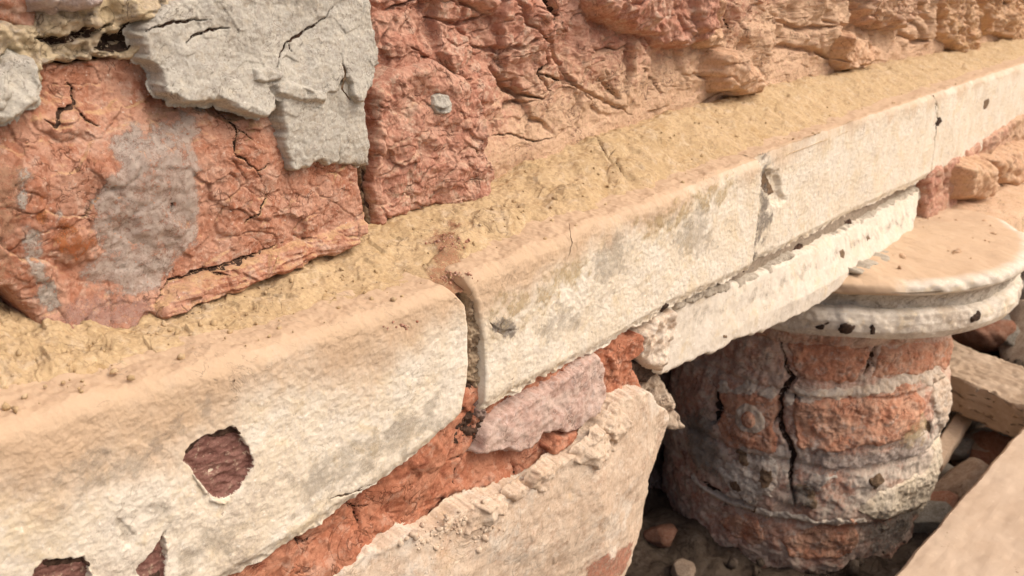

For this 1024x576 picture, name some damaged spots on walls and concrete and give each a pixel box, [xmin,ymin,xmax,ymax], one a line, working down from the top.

crack [145,19,226,42]
crack [278,17,326,59]
crack [36,25,106,129]
crack [341,65,351,101]
crack [218,113,269,222]
peeling [760,172,774,195]
crack [163,245,273,288]
crack [775,343,800,492]
peeling [183,426,254,505]
peeling [32,557,94,576]
peeling [136,531,169,576]